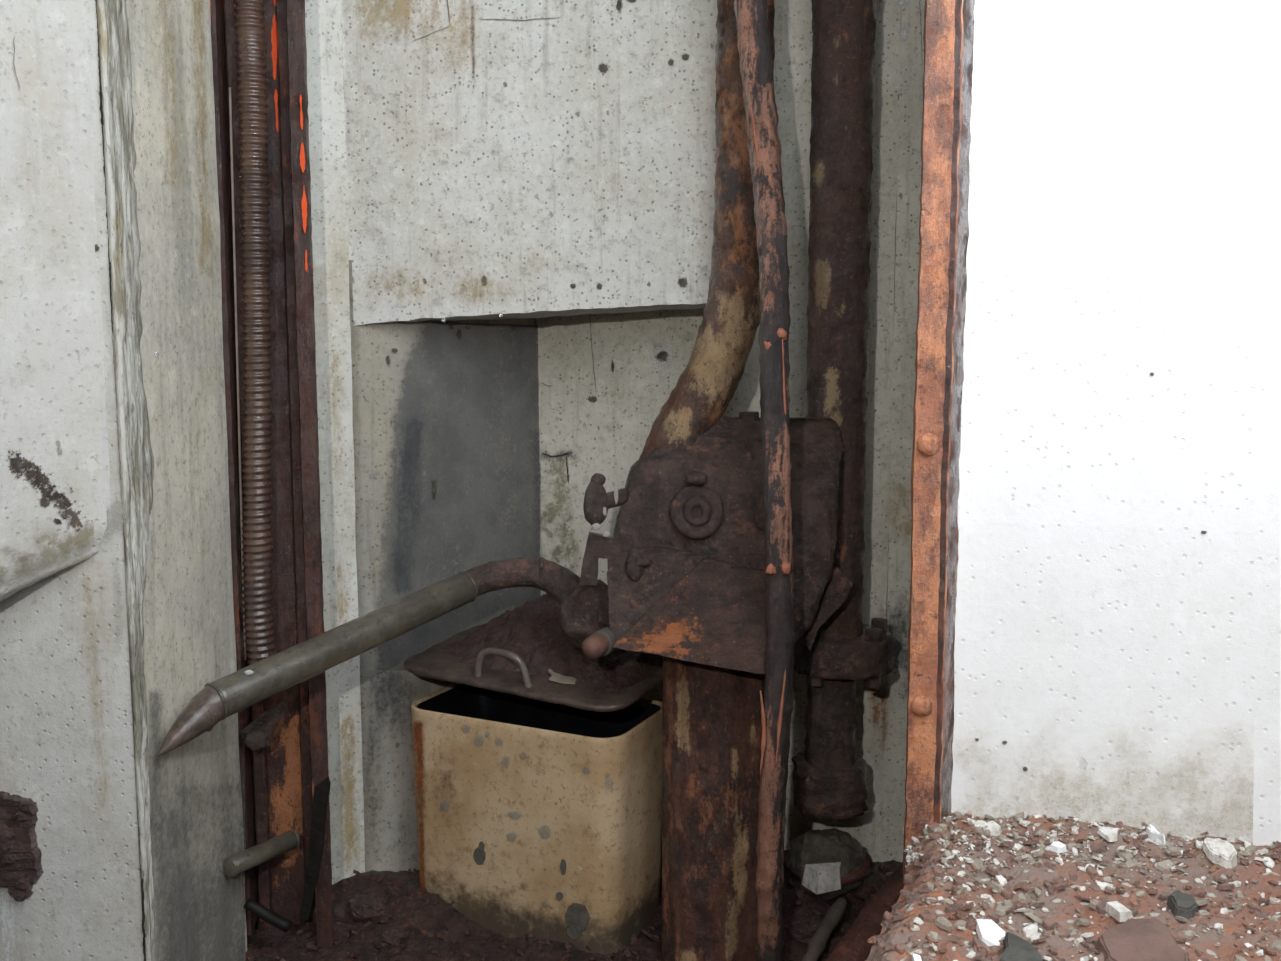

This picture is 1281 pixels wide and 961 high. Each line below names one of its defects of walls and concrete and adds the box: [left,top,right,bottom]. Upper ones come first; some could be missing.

leakage [378,322,541,606]
leakage [369,587,541,760]